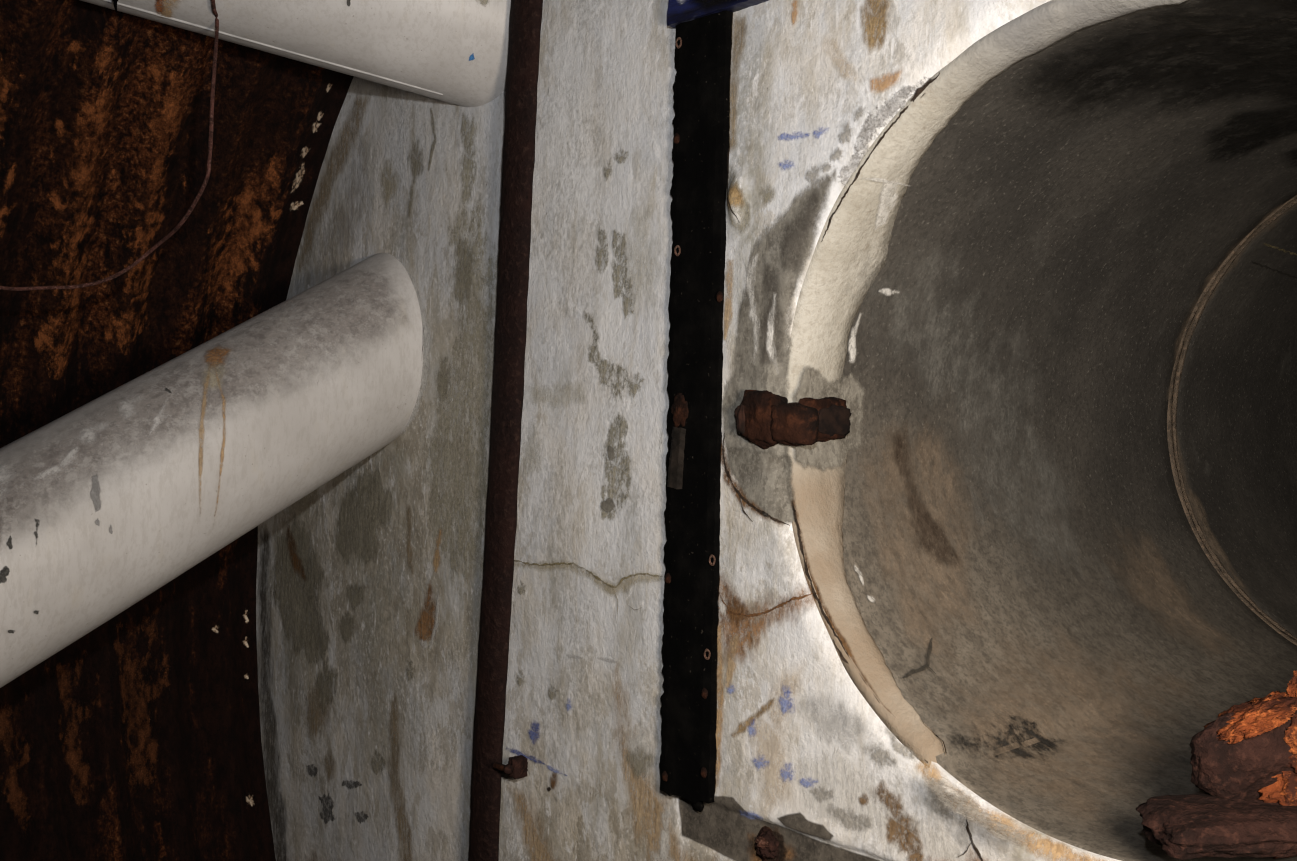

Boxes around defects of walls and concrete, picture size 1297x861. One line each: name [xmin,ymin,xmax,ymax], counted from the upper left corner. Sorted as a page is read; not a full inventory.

leakage [729,21,745,148]
corrosion [32,41,198,380]
corrosion [195,150,282,323]
leakage [724,262,732,339]
corrosion [199,348,229,503]
corrosion [114,607,169,791]
leakage [259,532,286,861]
leakage [371,698,412,861]
crack [514,560,659,615]
crack [718,433,928,763]
crack [902,638,936,678]
corrosion [1203,691,1297,806]